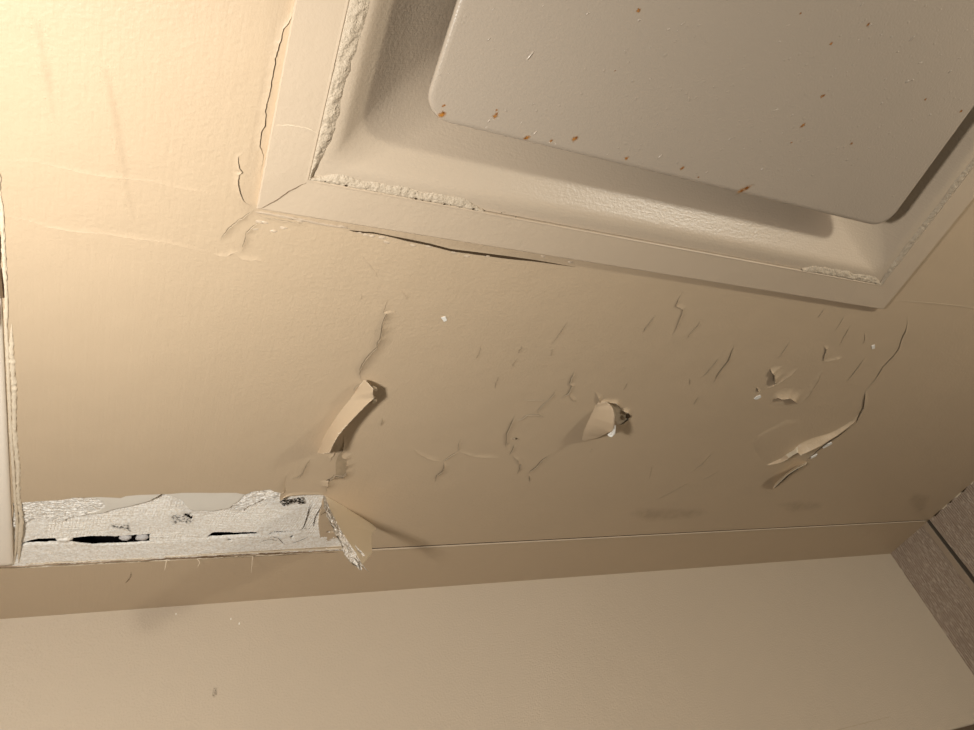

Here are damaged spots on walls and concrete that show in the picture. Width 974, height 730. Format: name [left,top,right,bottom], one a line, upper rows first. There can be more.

peeling [317,380,377,454]
peeling [582,390,633,442]
flaking render [12,475,342,568]